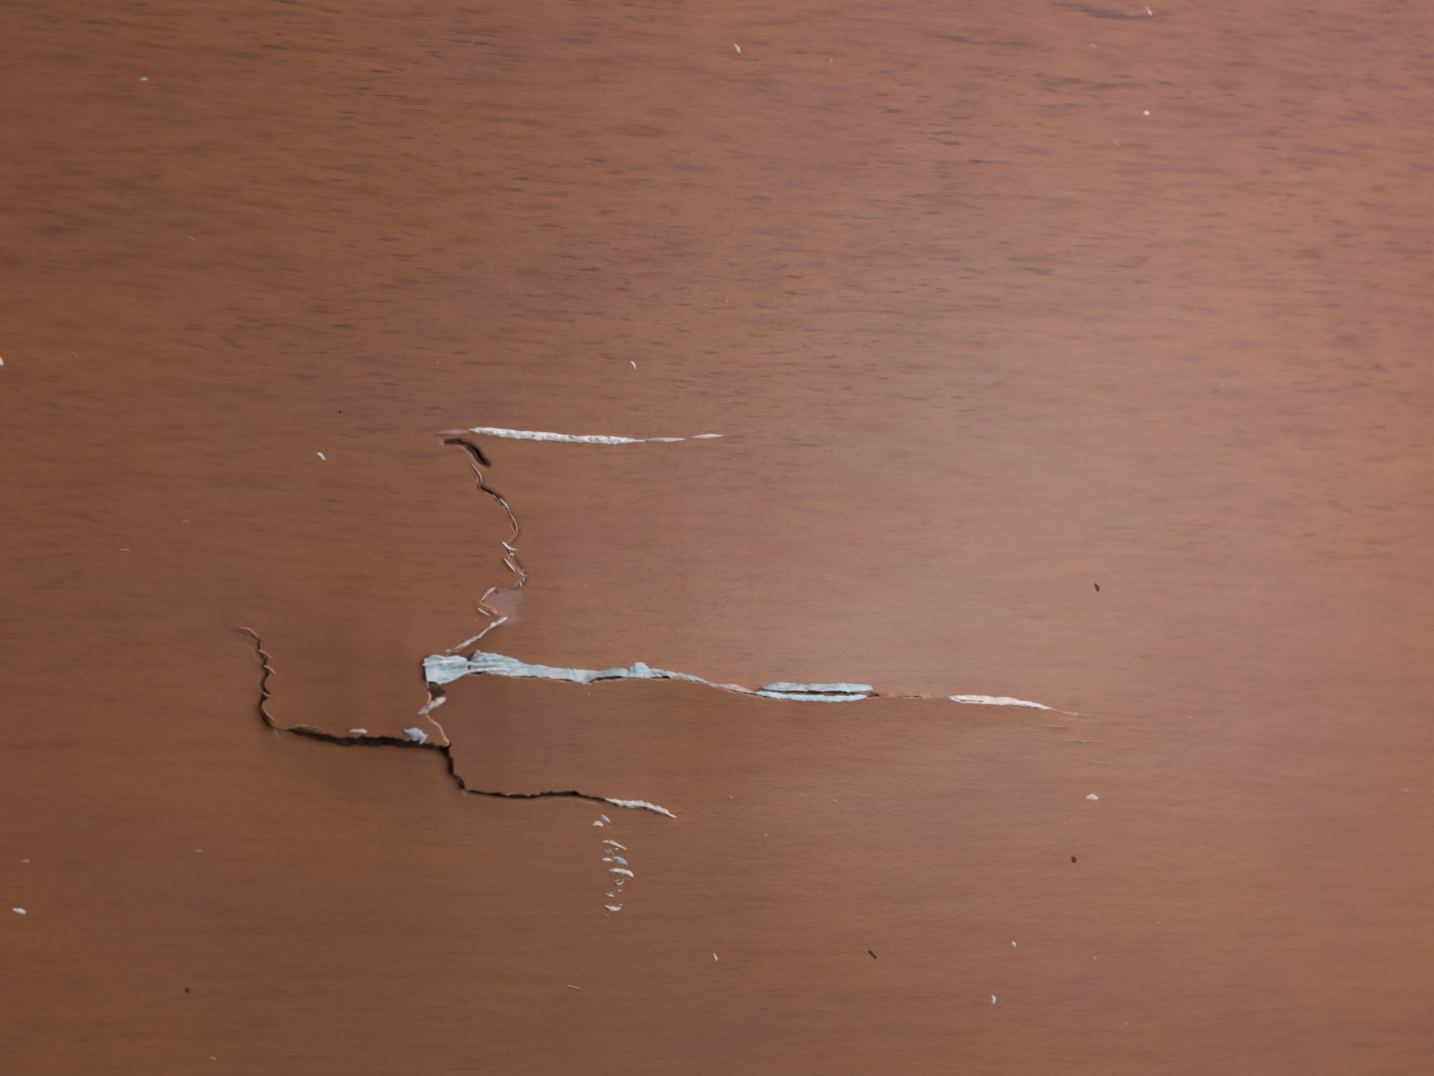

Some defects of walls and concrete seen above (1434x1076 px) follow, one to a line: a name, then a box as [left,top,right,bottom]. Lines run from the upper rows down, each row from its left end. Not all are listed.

crack [403,428,1110,800]
crack [349,727,367,735]
spalling [592,815,633,917]